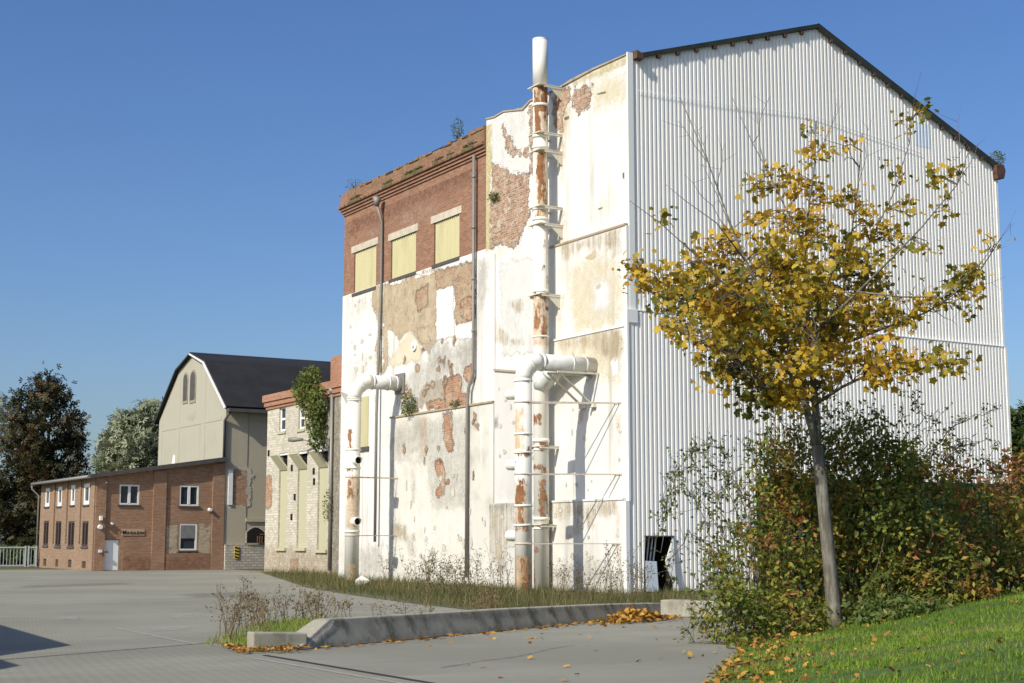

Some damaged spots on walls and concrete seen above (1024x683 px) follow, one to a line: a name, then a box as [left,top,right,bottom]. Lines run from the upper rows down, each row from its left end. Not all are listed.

corrosion [533,86,548,132]
flaking render [571,83,594,116]
flaking render [488,104,533,250]
corrosion [535,151,547,217]
corrosion [533,265,549,343]
peeling [349,261,479,509]
corrosion [515,409,548,532]
corrosion [516,547,538,591]